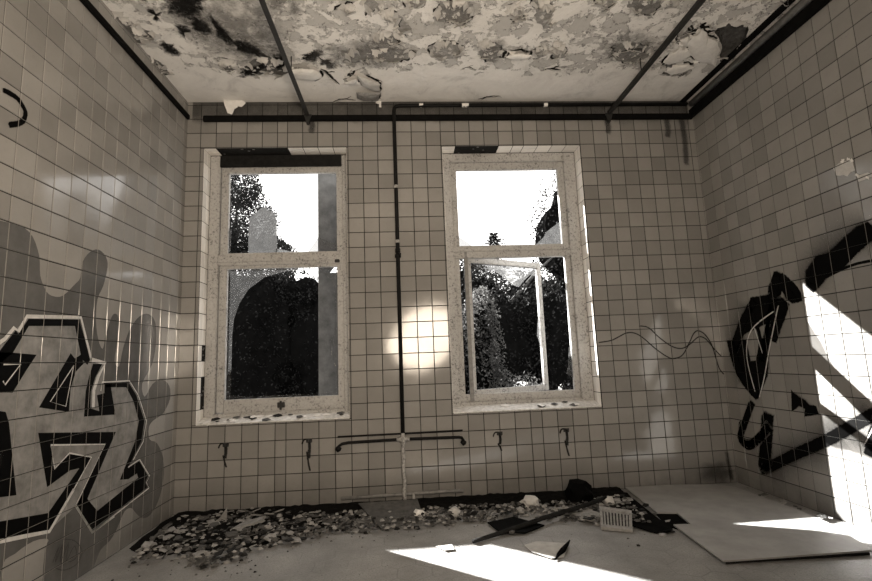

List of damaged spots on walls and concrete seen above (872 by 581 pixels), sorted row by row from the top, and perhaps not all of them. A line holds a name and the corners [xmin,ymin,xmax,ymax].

peeling [504,0,558,29]
peeling [591,0,682,16]
peeling [111,11,175,75]
peeling [334,0,475,107]
peeling [478,38,508,64]
peeling [530,41,567,60]
peeling [610,40,655,66]
spalling [658,18,751,78]
peeling [217,55,291,79]
peeling [223,100,246,114]
spalling [833,158,872,182]